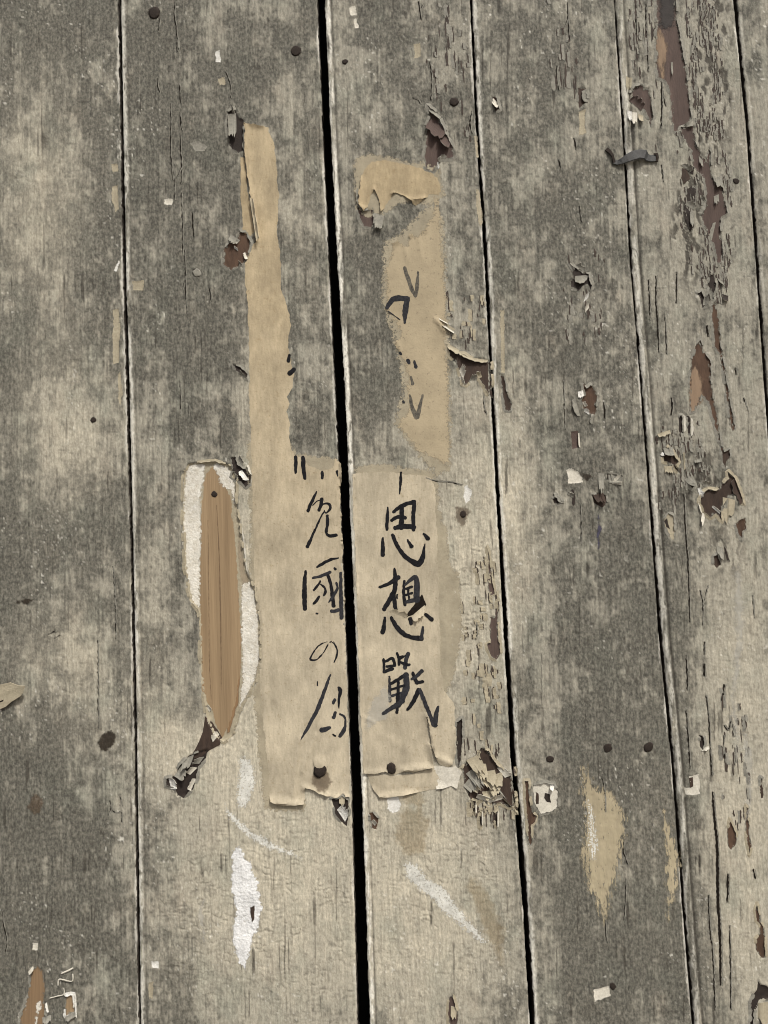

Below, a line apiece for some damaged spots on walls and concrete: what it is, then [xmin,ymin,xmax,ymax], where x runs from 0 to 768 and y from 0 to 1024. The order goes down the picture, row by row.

peeling [414,3,479,174]
peeling [221,229,254,271]
peeling [626,0,747,543]
peeling [439,291,513,413]
peeling [572,382,599,424]
peeling [711,545,730,568]
peeling [163,455,262,799]
peeling [455,544,561,846]
peeling [17,966,77,1024]